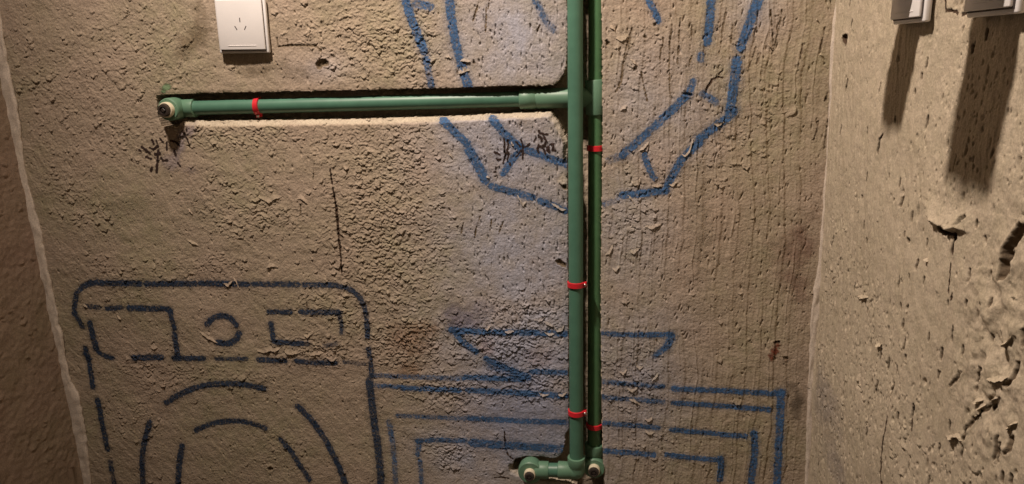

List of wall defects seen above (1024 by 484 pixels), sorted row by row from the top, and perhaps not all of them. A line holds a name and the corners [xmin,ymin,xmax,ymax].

hole [938,226,957,255]
hole [998,223,1024,280]
flaking render [940,362,1021,457]
flaking render [993,421,1018,484]